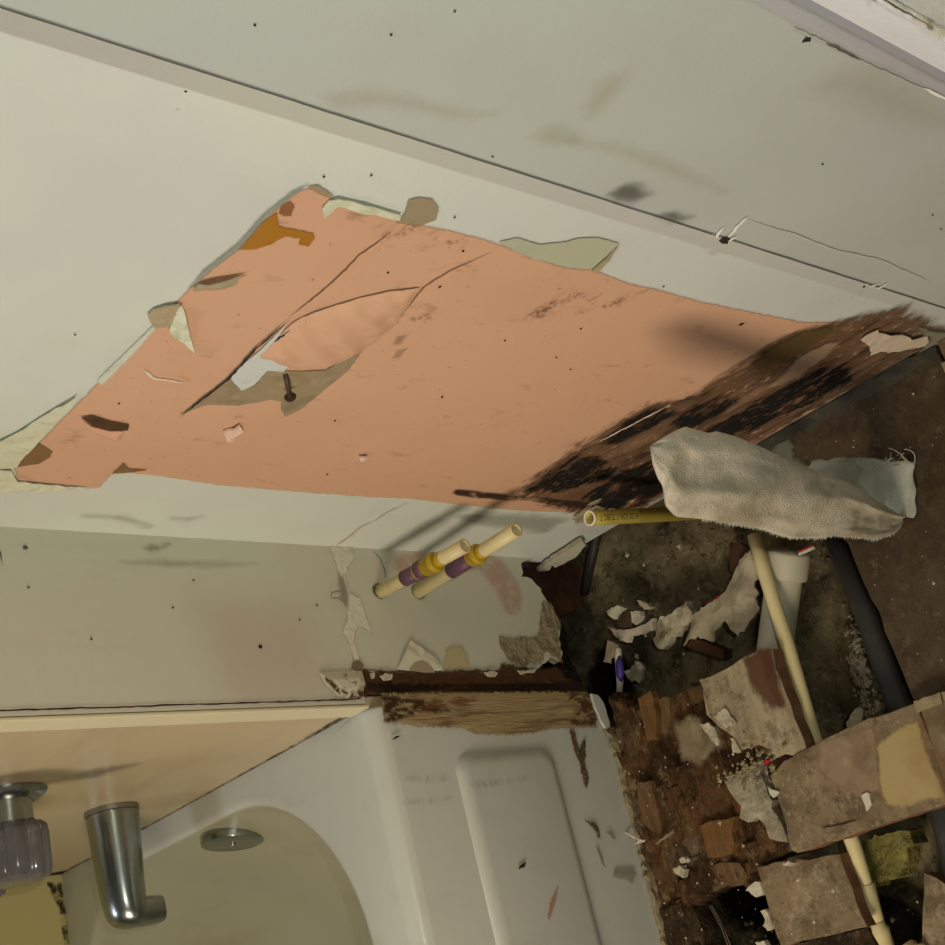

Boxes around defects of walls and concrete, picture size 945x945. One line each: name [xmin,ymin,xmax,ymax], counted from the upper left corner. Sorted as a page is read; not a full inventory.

crack [873,0,934,30]
crack [0,6,945,322]
peeling [0,185,915,524]
damp [454,306,945,512]
flaking render [499,601,562,667]